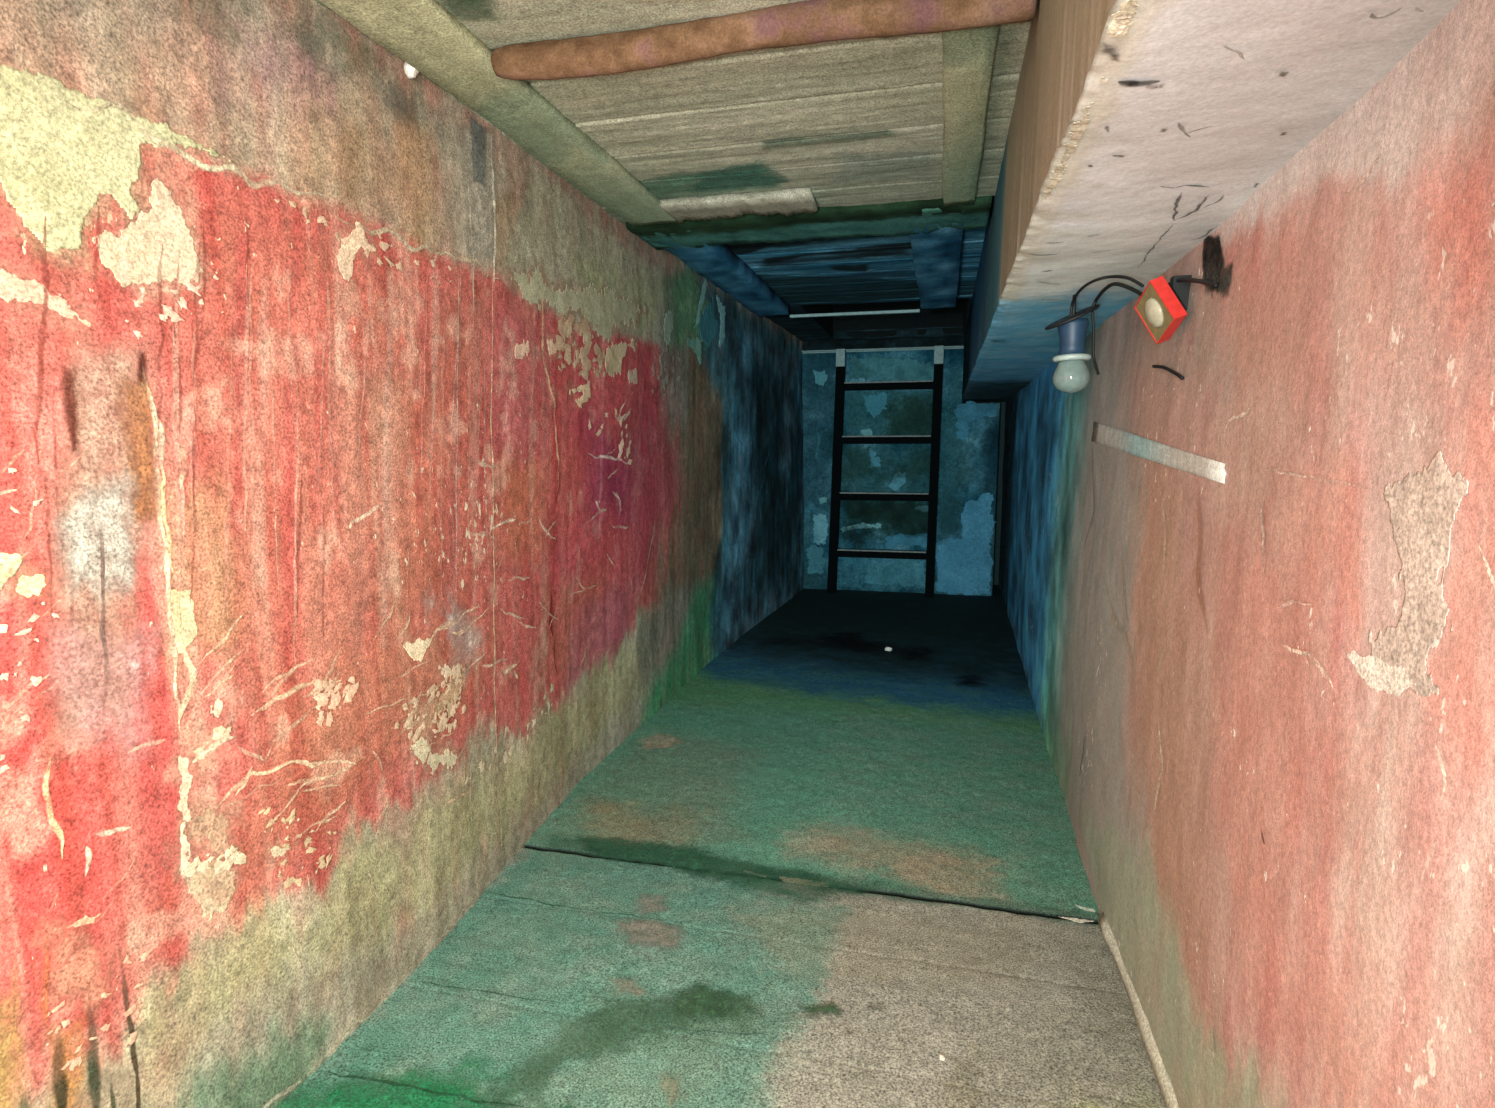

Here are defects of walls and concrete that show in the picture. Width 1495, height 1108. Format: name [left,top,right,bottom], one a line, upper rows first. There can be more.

water stain [696,165,788,190]
water stain [764,130,892,149]
peeling [0,64,726,465]
peeling [0,552,59,636]
peeling [310,677,359,727]
peeling [394,638,554,785]
peeling [177,698,247,921]
peeling [258,807,336,888]
peeling [41,913,150,1071]
water stain [54,981,140,1108]
water stain [677,985,749,1017]
water stain [806,1004,840,1015]